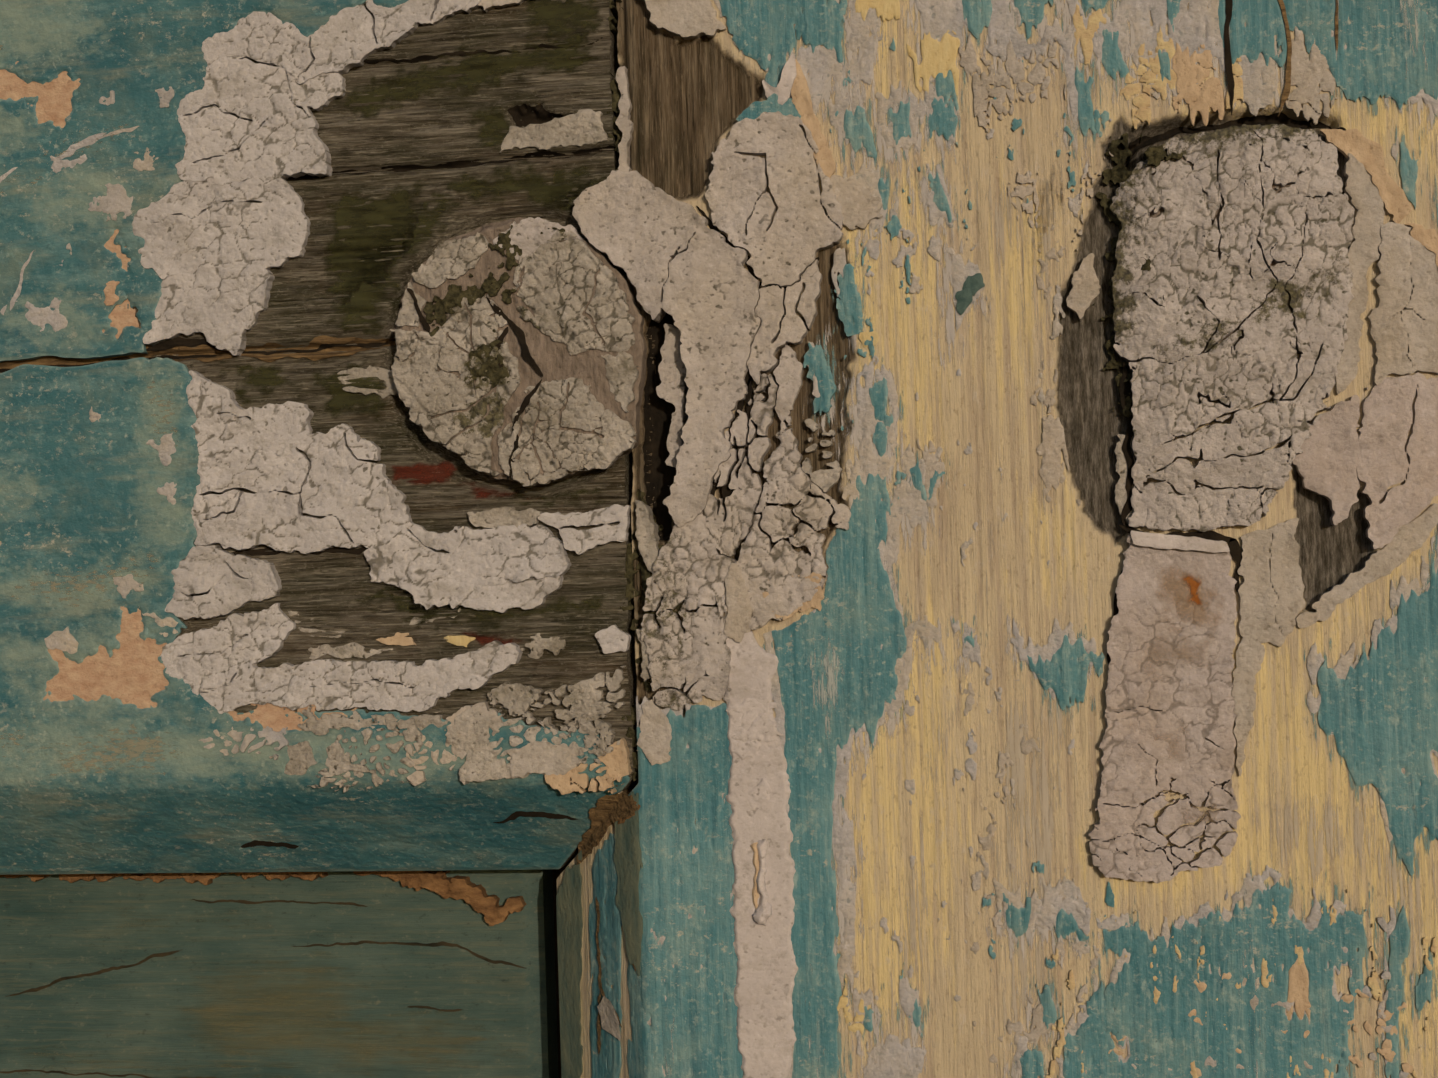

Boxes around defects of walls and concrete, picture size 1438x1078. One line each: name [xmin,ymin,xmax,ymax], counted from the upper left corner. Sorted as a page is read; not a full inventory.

peeling [0,61,81,128]
crack [363,39,599,64]
crack [645,0,727,40]
crack [1125,0,1346,167]
peeling [50,126,123,173]
peeling [88,0,534,356]
peeling [500,104,608,153]
peeling [0,297,68,332]
crack [291,66,883,765]
peeling [12,313,678,795]
peeling [762,0,1438,1078]